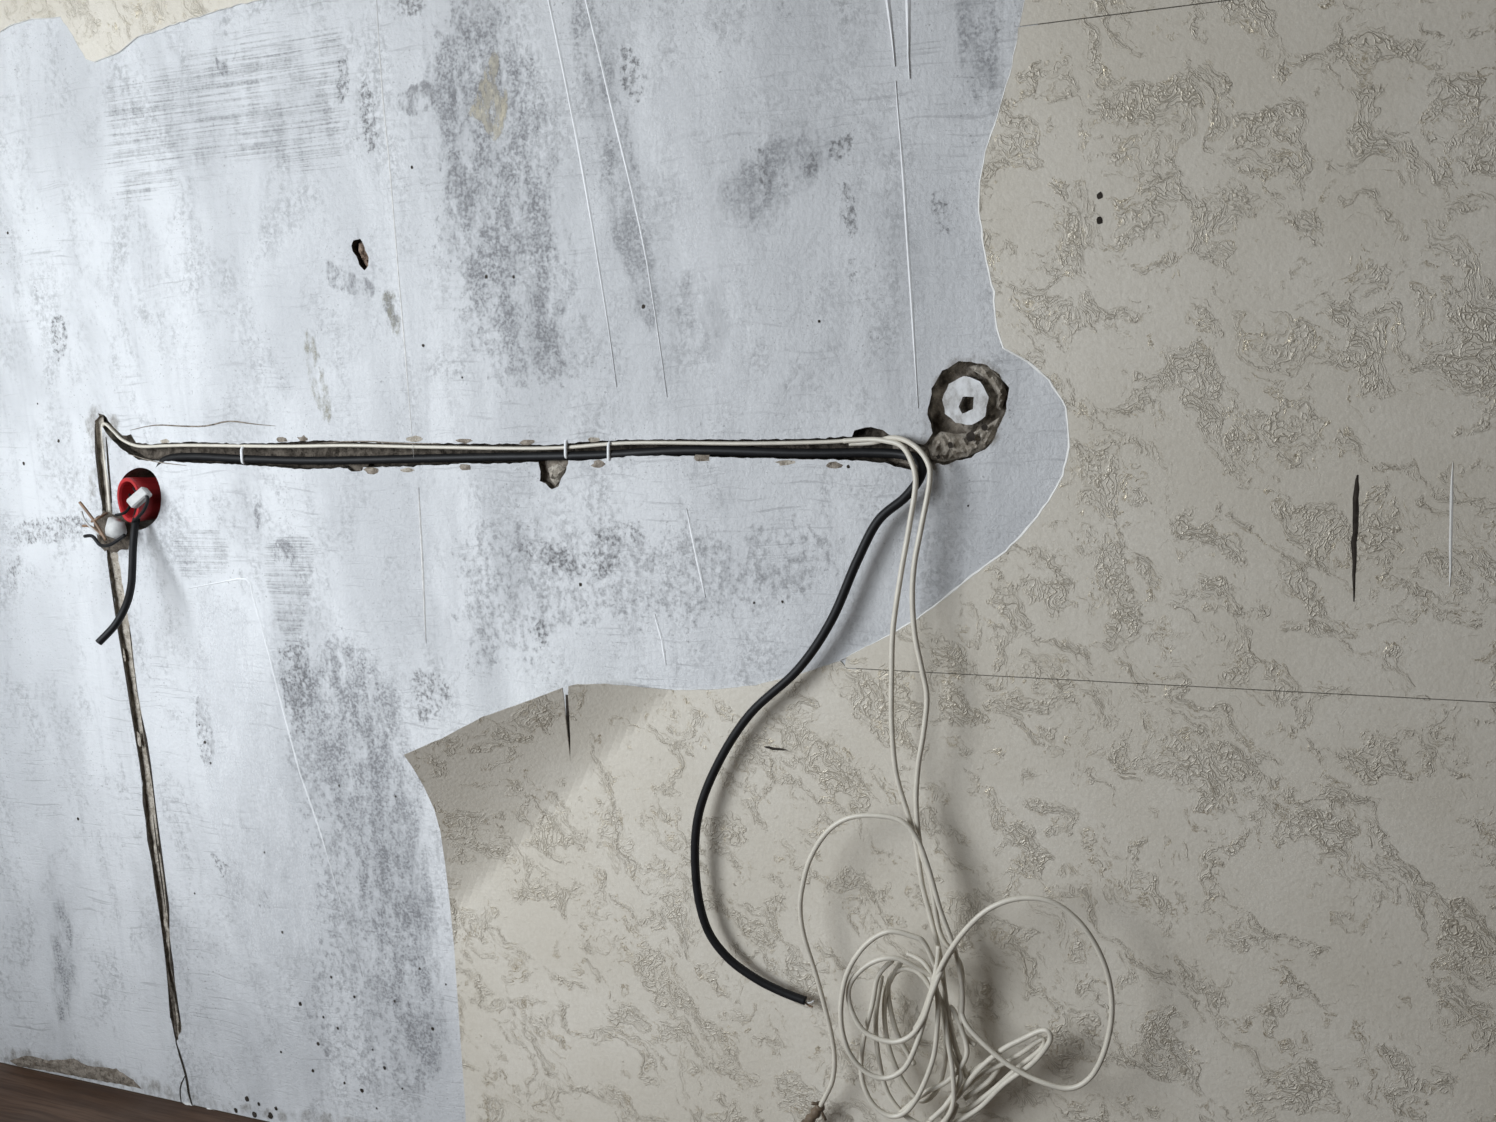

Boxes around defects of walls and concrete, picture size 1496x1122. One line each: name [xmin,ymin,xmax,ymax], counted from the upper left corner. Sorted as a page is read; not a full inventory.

peeling [0,0,1070,1122]